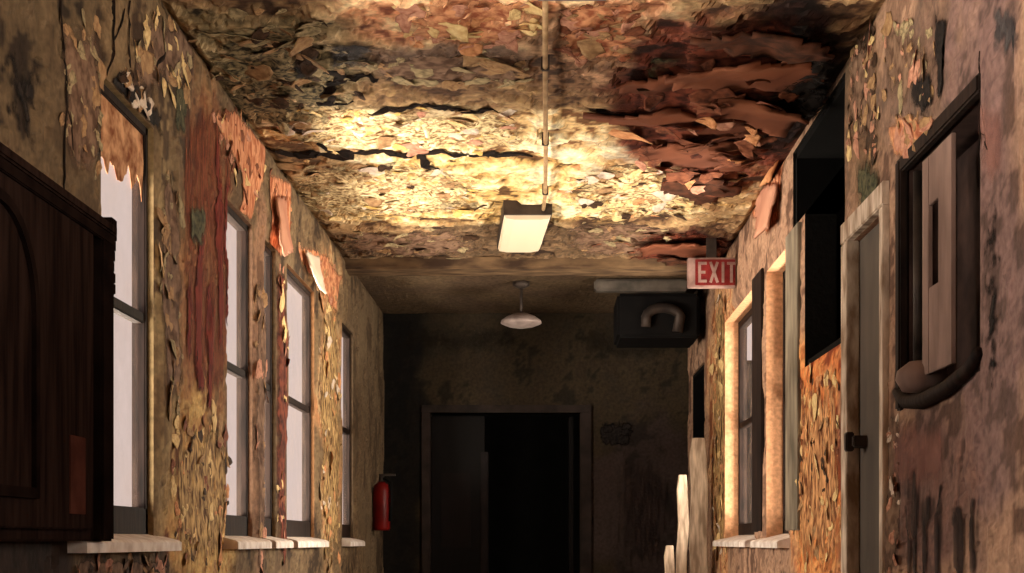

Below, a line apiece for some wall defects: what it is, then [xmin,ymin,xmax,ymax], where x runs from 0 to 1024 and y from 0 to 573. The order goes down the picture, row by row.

damp [7,54,39,142]
crack [265,143,533,170]
peeling [552,0,654,67]
spalling [752,11,946,239]
peeling [59,0,542,573]
peeling [793,205,845,573]
damp [894,431,975,573]